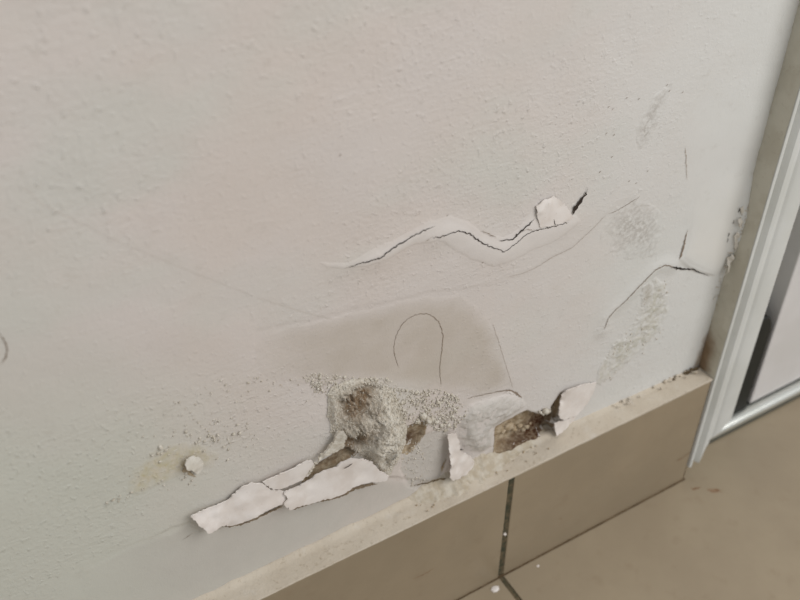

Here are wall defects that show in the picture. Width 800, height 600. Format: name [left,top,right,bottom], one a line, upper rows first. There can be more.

crack [346,189,588,268]
crack [603,231,703,332]
peeling [150,420,241,485]
peeling [191,430,389,534]
flaking render [392,388,475,487]
flaking render [493,382,597,454]